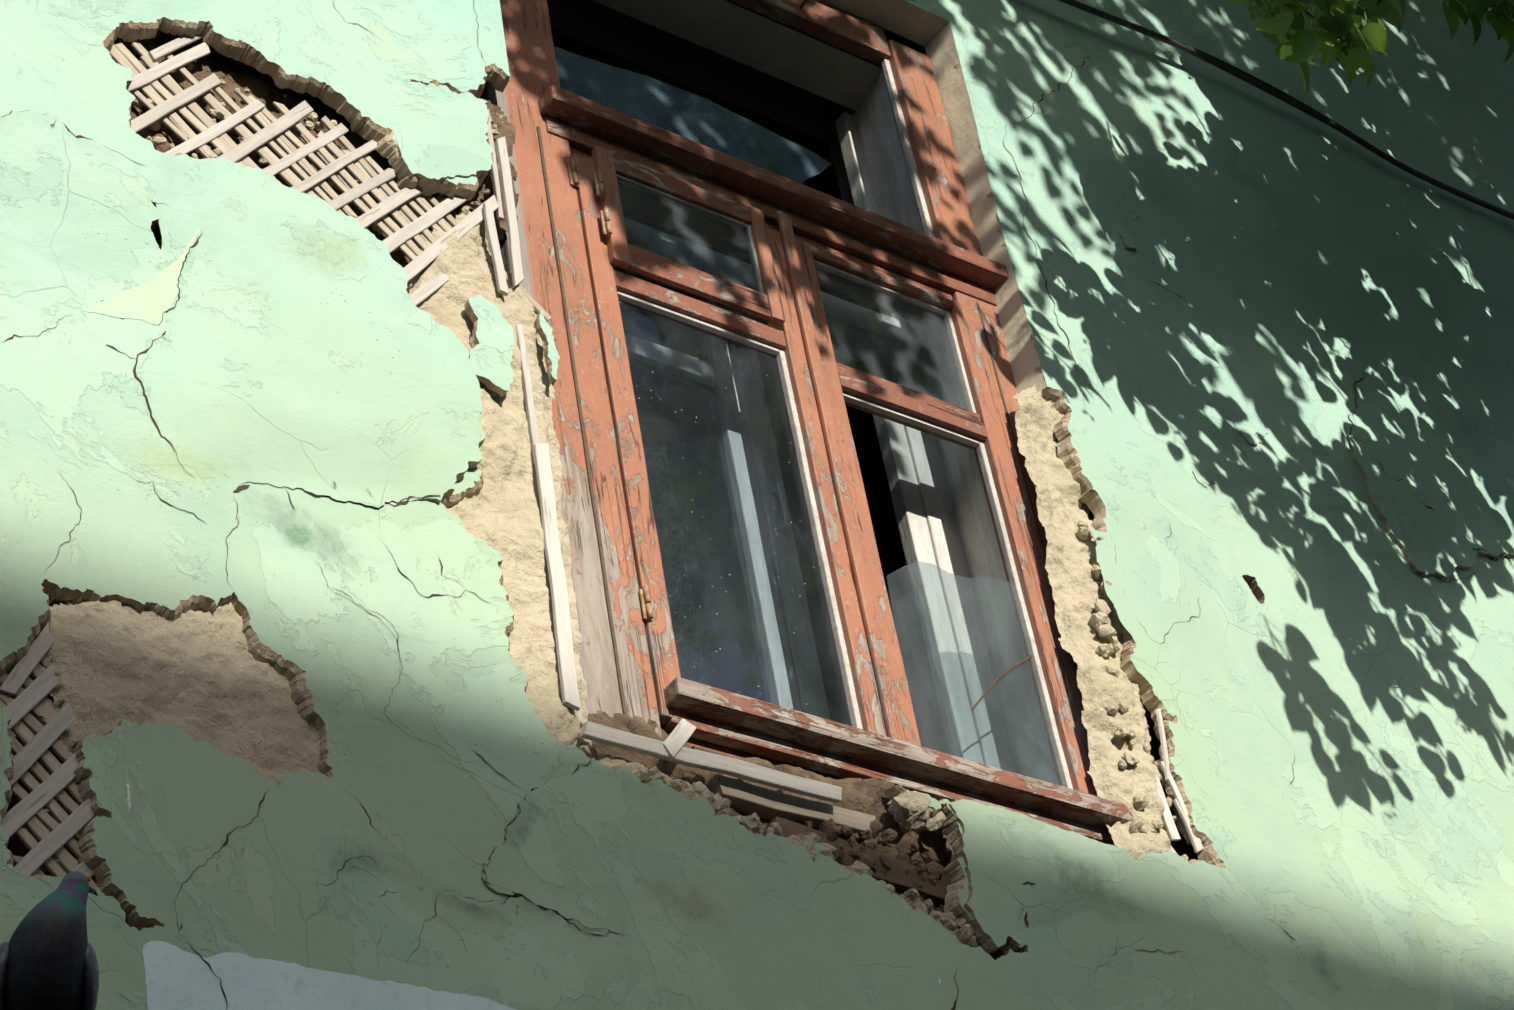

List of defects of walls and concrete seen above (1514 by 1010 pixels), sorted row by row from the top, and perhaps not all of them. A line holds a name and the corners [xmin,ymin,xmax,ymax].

peeling [81,227,202,326]
flaking render [0,600,321,888]
crack [105,331,441,586]
crack [387,547,497,606]
flaking render [110,30,978,947]
flaking render [1013,384,1204,861]